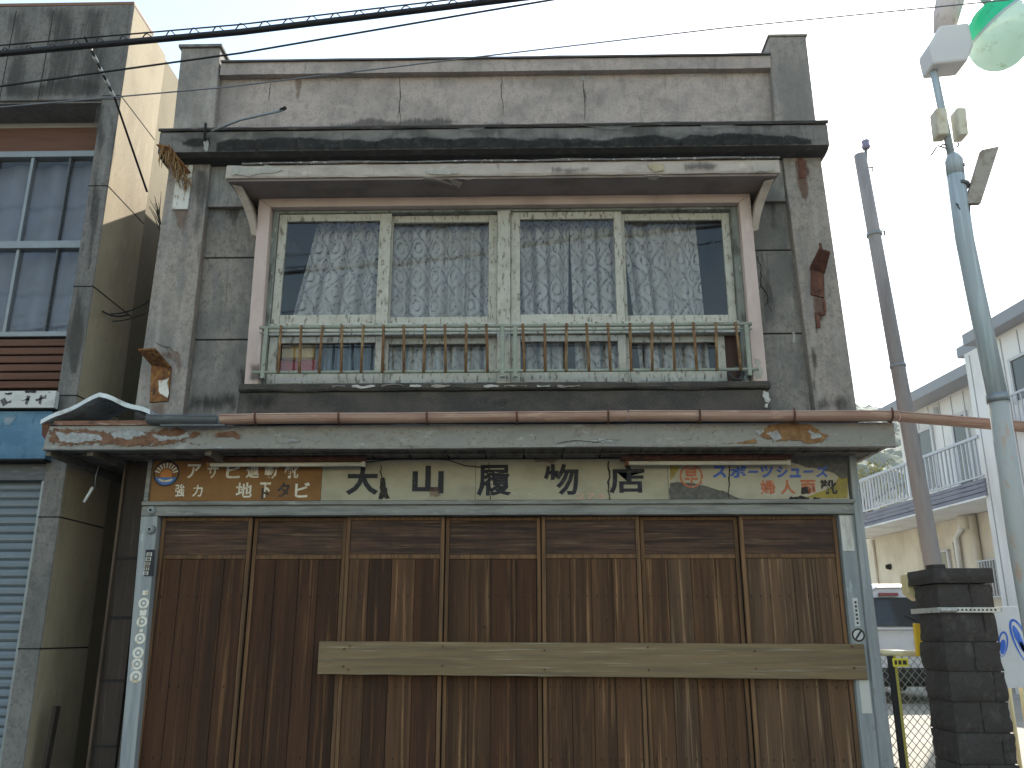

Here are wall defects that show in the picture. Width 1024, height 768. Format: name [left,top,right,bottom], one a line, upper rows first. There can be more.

leakage [183,133,811,151]
peeling [42,423,200,447]